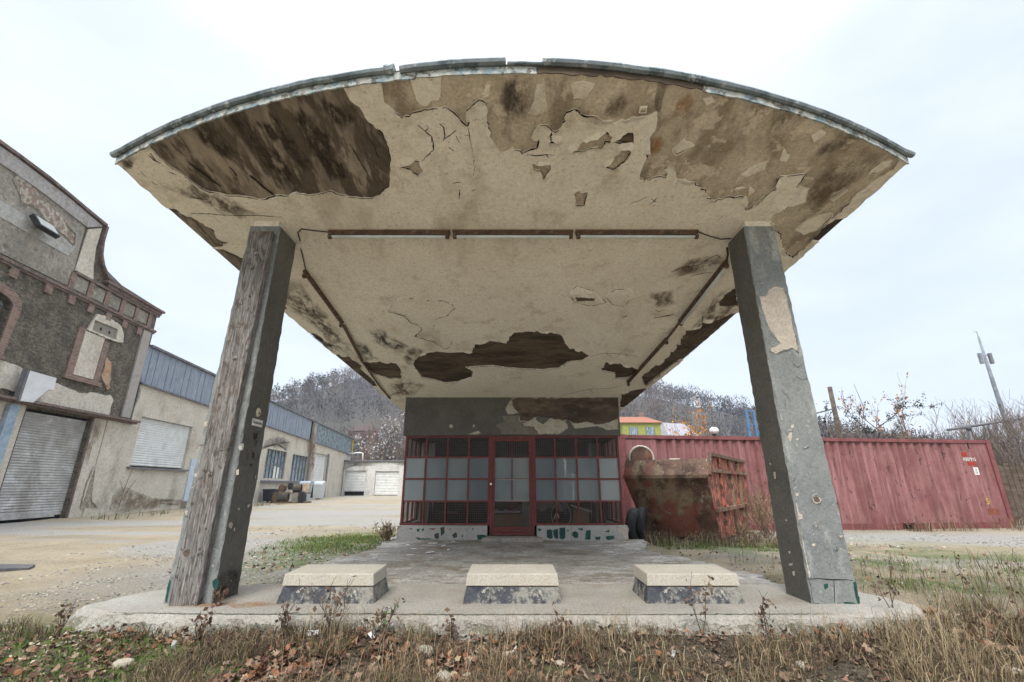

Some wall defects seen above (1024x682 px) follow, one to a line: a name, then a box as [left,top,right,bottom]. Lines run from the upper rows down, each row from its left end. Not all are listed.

spalling [151,88,428,201]
peeling [382,72,899,258]
peeling [758,284,799,354]
spalling [336,329,589,386]
spalling [495,287,738,435]
peeling [409,527,487,540]
peeling [538,526,629,540]